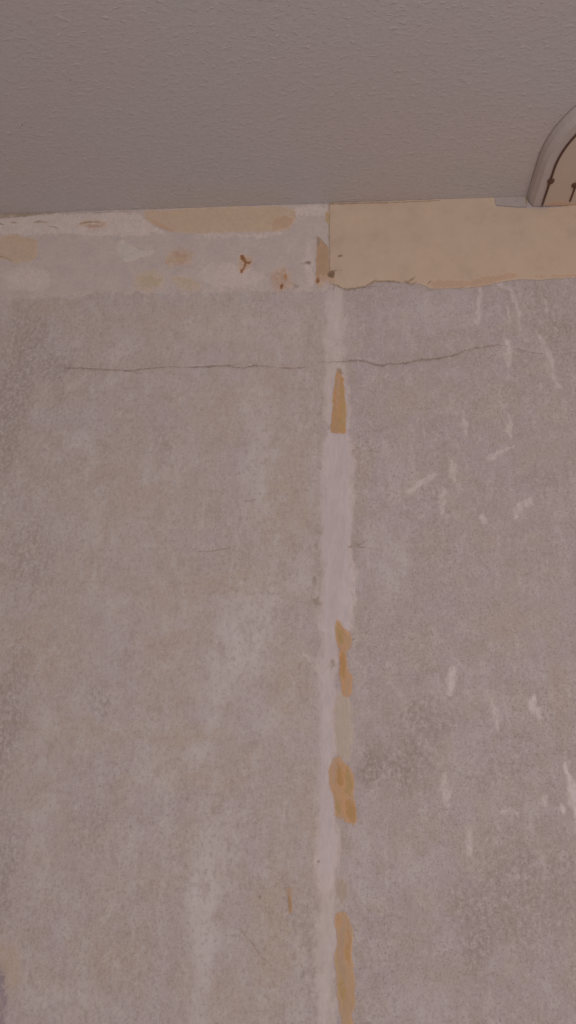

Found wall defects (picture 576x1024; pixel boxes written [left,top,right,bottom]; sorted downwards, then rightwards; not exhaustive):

rust [239,255,251,273]
peeling [0,198,576,299]
crack [331,345,495,366]
peeling [330,368,347,434]
peeling [335,619,352,698]
peeling [328,757,357,826]
peeling [335,912,355,1024]